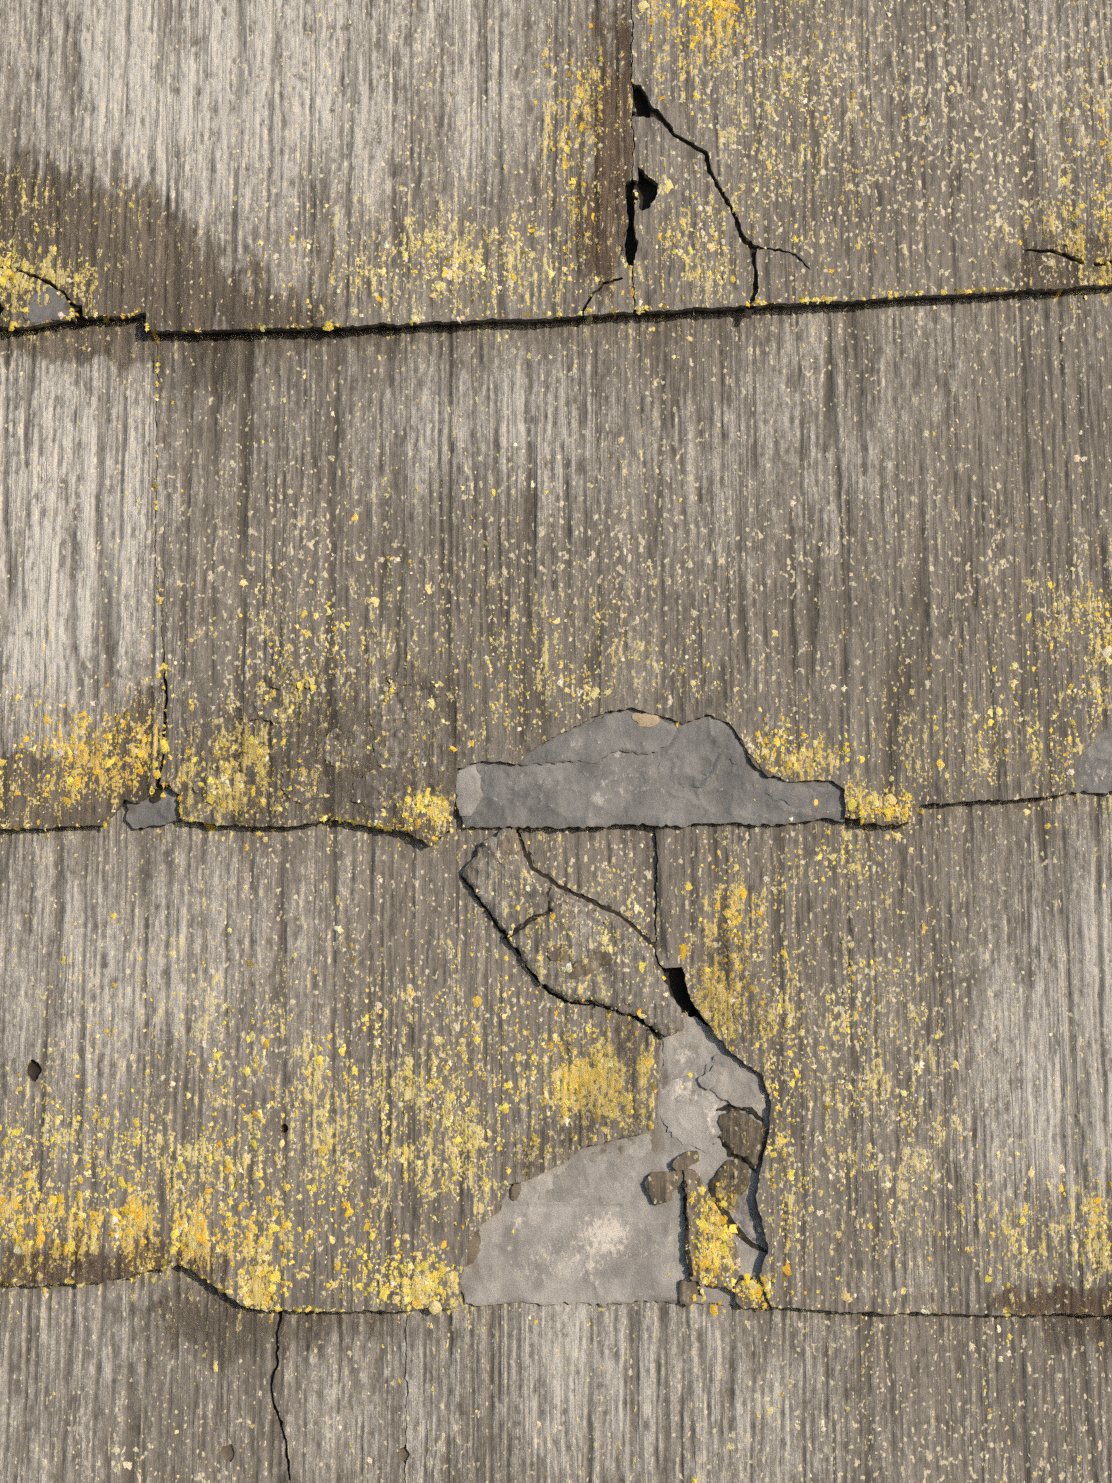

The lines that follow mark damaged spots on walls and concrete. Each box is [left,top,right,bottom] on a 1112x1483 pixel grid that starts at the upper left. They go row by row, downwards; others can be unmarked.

crack [650,110,807,319]
crack [1025,250,1112,267]
crack [581,279,622,317]
peeling [236,667,316,724]
spalling [1046,724,1112,794]
spalling [281,667,845,1309]
crack [270,1311,291,1479]